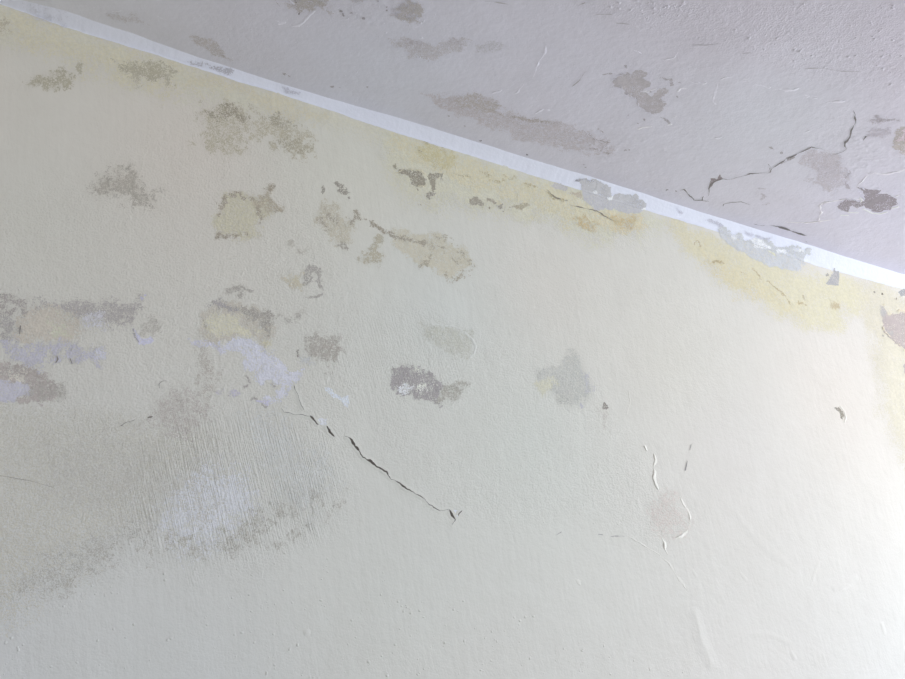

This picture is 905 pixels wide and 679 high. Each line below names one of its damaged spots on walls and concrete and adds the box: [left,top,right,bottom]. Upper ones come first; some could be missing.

peeling [602,65,686,130]
peeling [866,115,905,155]
crack [683,112,866,206]
peeling [834,169,899,216]
peeling [879,304,905,351]
peeling [0,360,66,406]
peeling [188,336,314,408]
peeling [390,363,471,408]
crack [279,384,464,526]